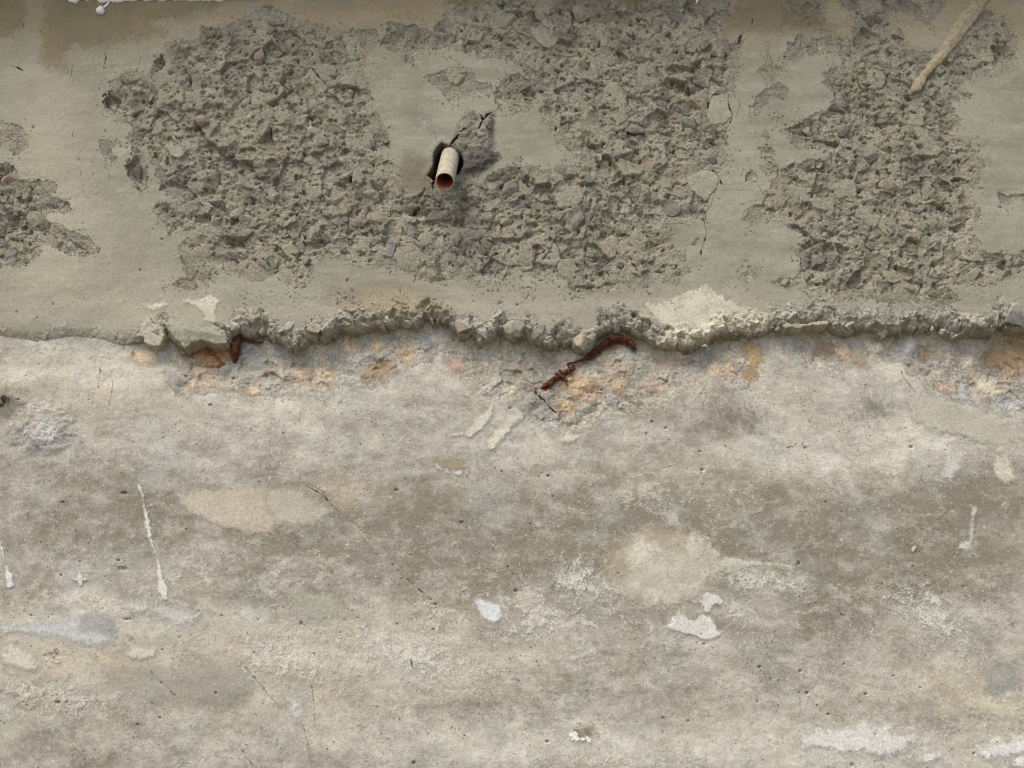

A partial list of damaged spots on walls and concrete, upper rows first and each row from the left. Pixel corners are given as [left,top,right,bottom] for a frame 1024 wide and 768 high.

spalling [0,0,1024,435]
corrosion [175,334,264,368]
corrosion [541,334,637,401]